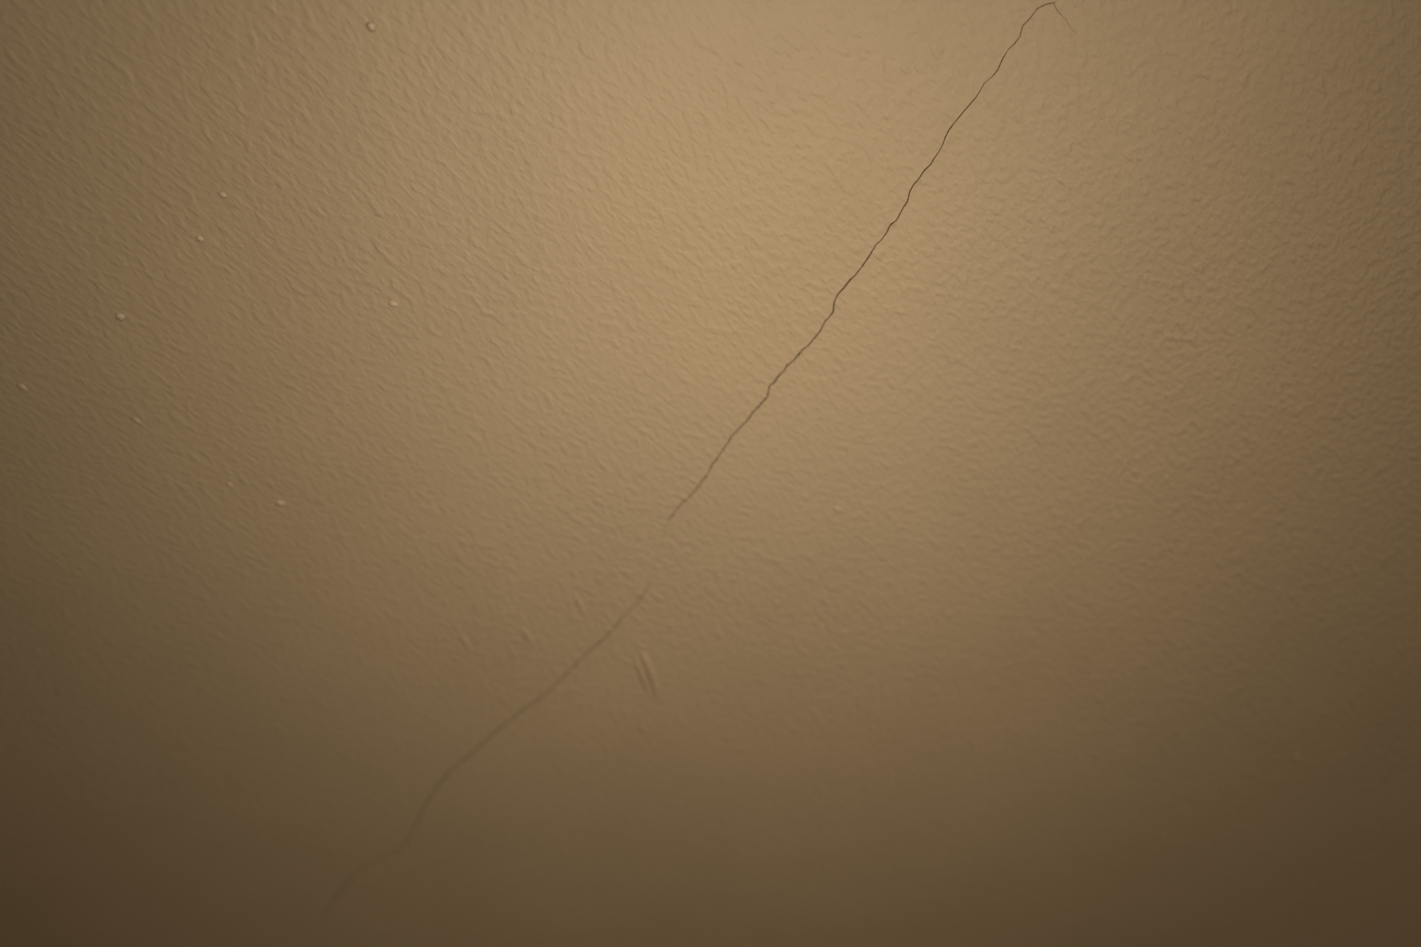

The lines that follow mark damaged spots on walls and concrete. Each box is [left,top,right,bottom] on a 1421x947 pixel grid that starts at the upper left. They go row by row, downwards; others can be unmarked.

crack [324,0,1071,915]